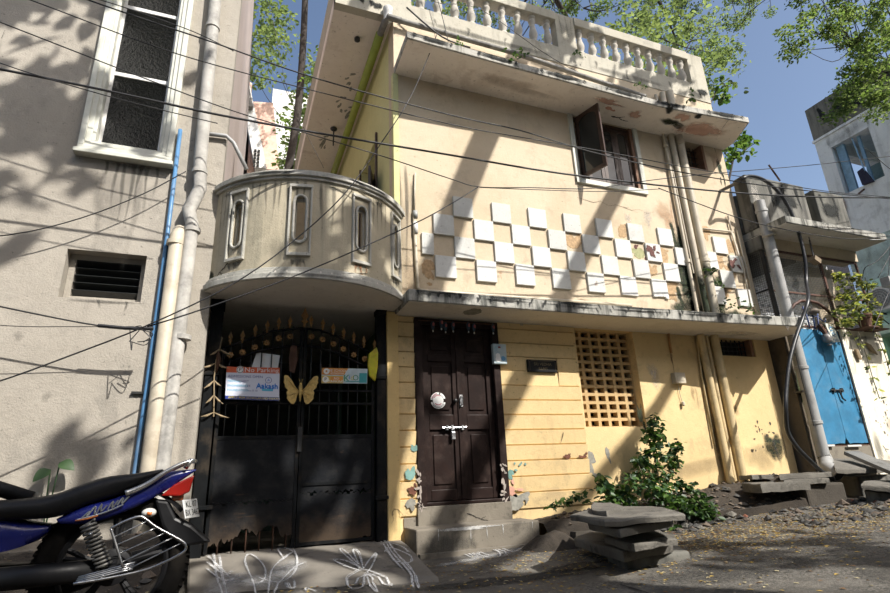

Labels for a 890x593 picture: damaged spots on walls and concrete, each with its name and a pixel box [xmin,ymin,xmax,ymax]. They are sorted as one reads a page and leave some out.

peeling [675,114,718,136]
peeling [618,224,628,238]
peeling [631,244,668,276]
water stain [764,435,783,458]
peeling [405,466,426,512]
peeling [500,462,530,511]